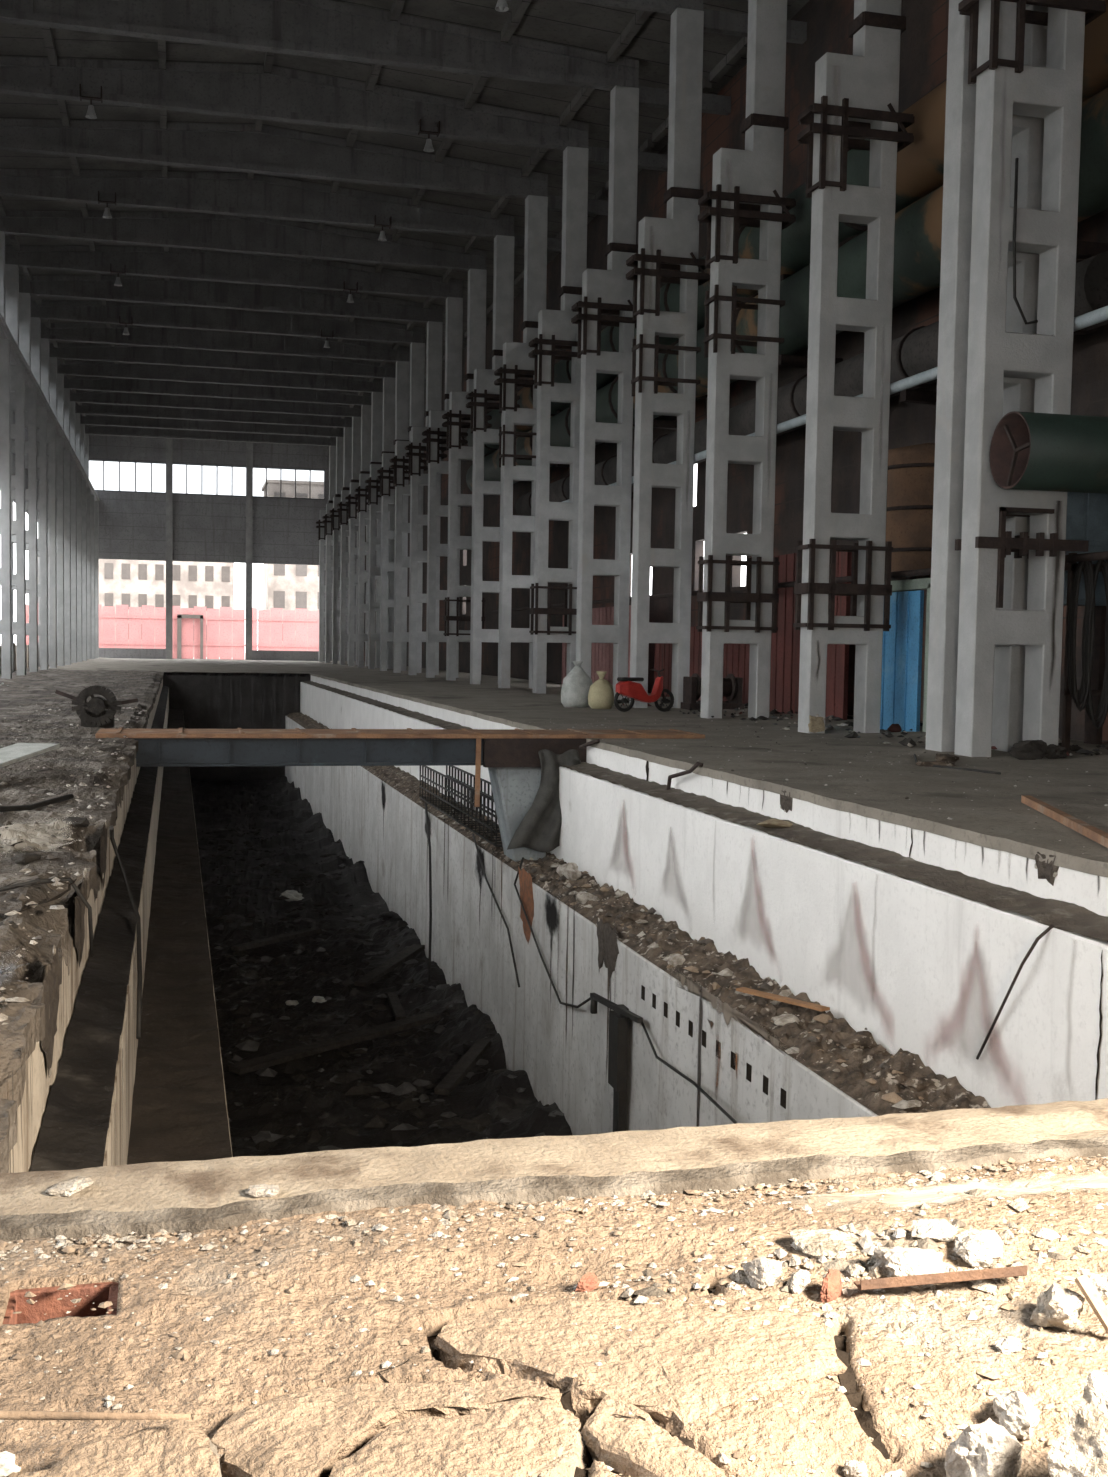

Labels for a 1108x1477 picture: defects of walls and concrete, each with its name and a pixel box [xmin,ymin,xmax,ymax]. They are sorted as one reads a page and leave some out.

spalling [9,758,163,1173]
spalling [547,739,1108,1108]
crack [378,1334,441,1383]
crack [575,1460,624,1477]
crack [547,1383,696,1450]
crack [826,1332,890,1459]